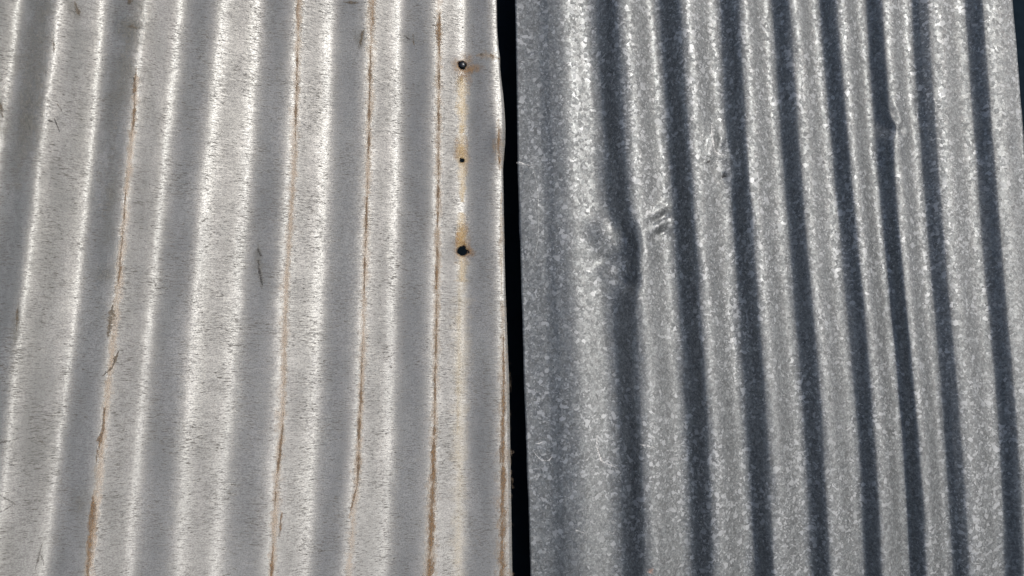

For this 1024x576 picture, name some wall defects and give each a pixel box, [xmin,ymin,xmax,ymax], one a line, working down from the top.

rust [363,0,374,299]
rust [86,497,101,576]
rust [96,391,109,476]
rust [274,421,284,533]
rust [349,331,364,543]
rust [427,302,438,576]